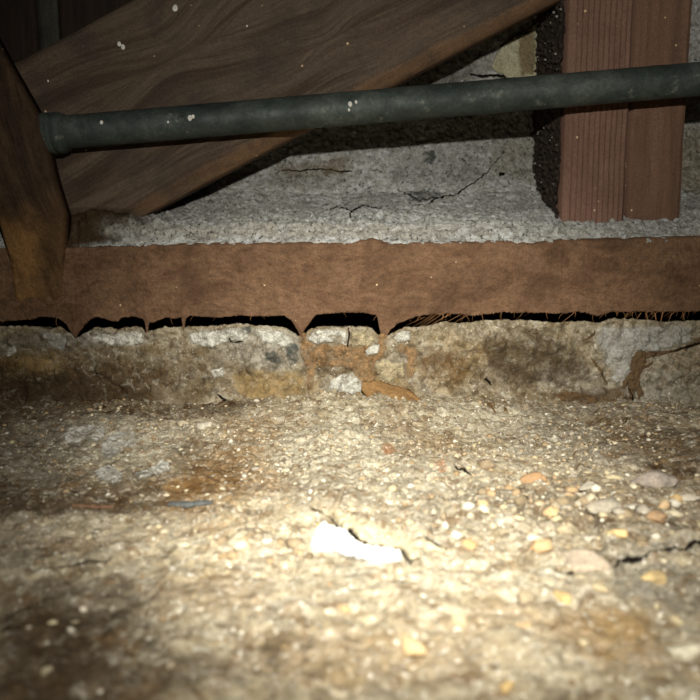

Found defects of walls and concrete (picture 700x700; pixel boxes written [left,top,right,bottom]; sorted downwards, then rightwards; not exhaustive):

crack [278,166,352,174]
crack [398,150,505,206]
crack [326,205,378,218]
crack [302,502,420,565]
crack [612,540,700,569]